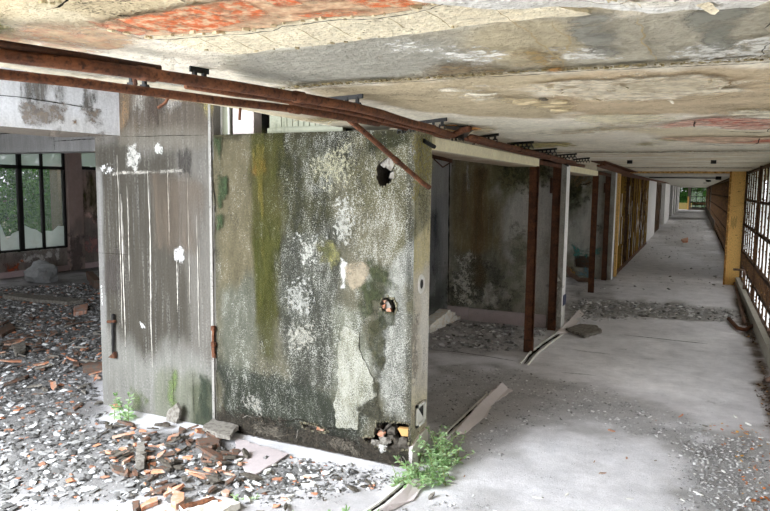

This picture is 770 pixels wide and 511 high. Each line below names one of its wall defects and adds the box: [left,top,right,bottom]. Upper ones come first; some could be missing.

flaking render [0,0,770,55]
damp [19,82,67,126]
damp [81,89,101,124]
spalling [651,117,770,146]
spalling [375,157,396,189]
damp [287,138,355,314]
damp [441,222,527,310]
damp [288,324,316,350]
damp [356,260,396,423]
flaking render [217,326,414,468]